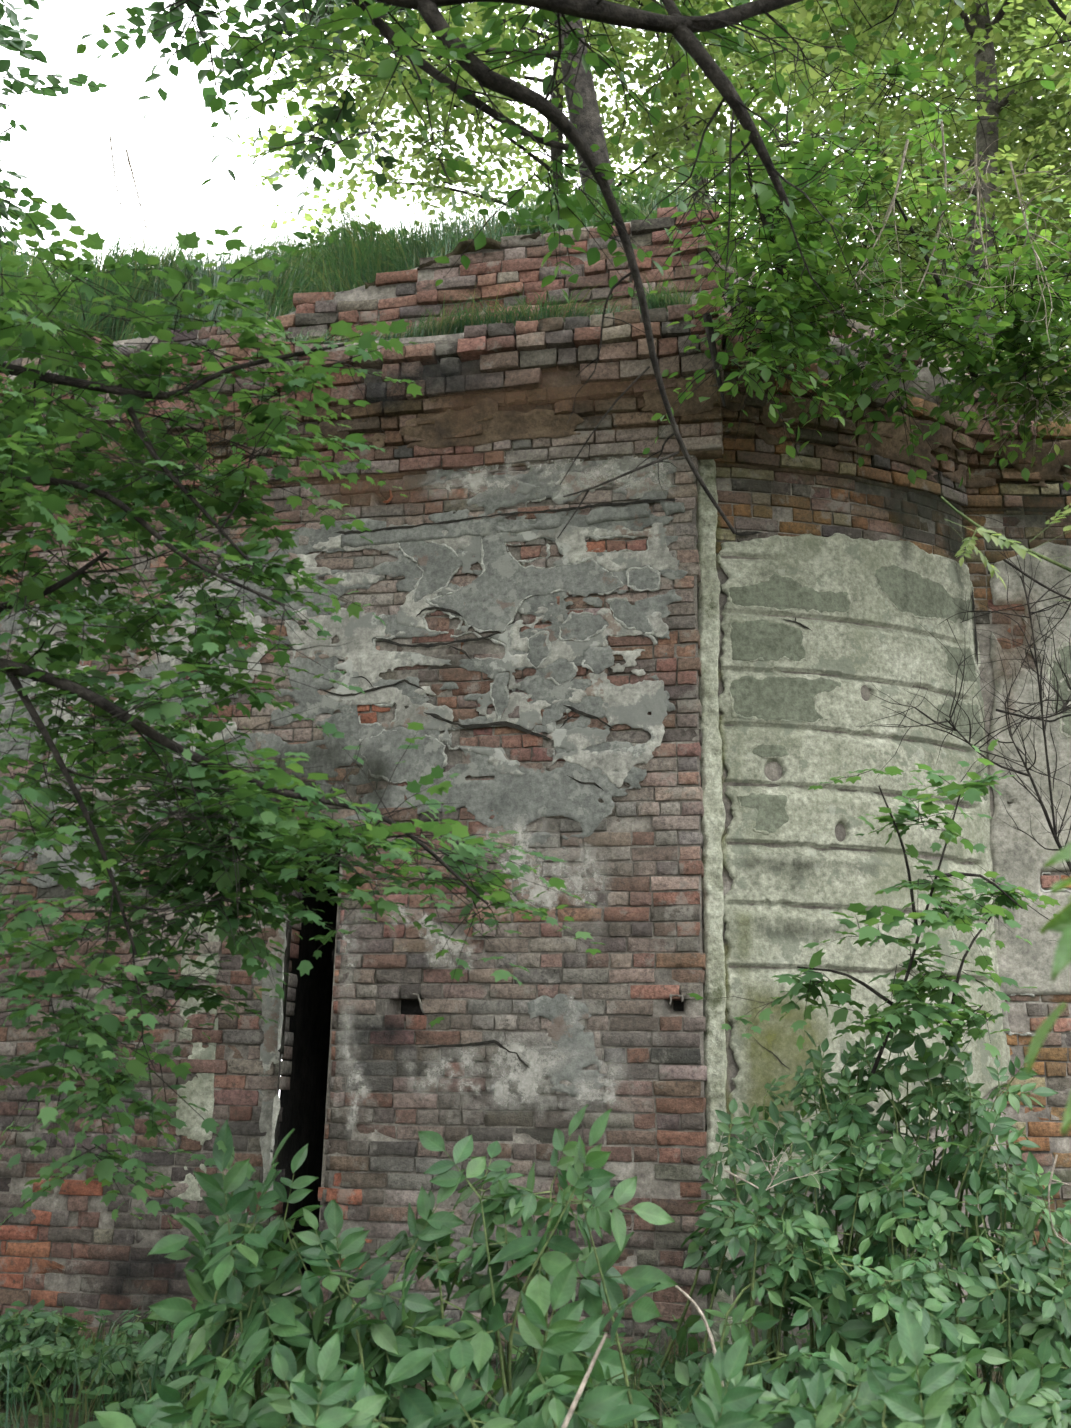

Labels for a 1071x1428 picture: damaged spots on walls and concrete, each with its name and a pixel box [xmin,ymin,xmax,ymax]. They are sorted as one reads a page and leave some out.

flaking render [350,533,660,784]